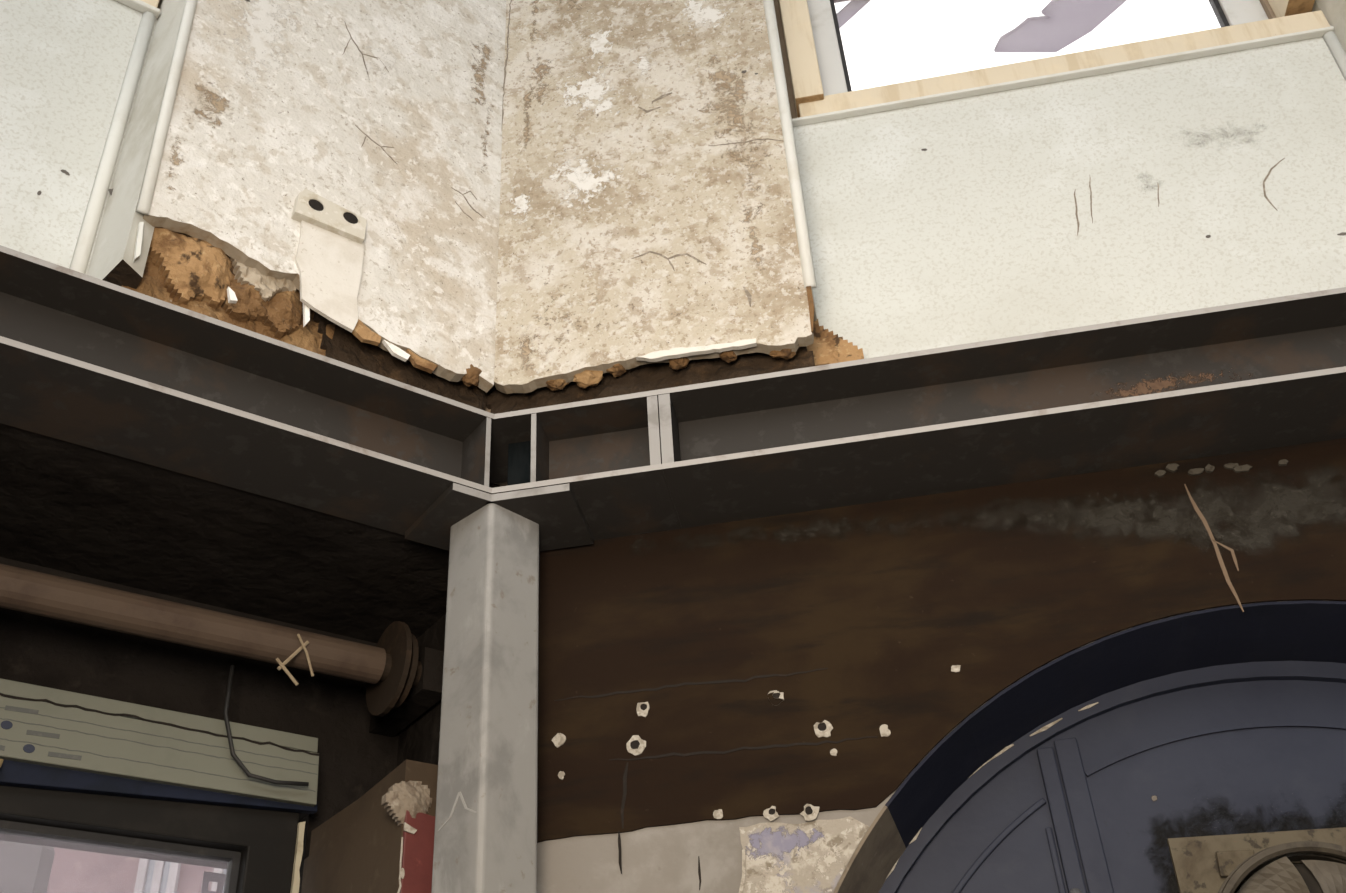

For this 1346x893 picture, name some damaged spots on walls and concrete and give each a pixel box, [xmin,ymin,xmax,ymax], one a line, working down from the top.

leakage [524,57,553,146]
leakage [699,55,768,271]
spalling [121,222,864,414]
leakage [520,309,581,369]
spalling [552,733,566,748]
spalling [626,735,646,756]
spalling [636,702,650,717]
spalling [814,720,838,756]
spalling [879,724,891,737]
peeling [970,744,1014,777]
peeling [1030,718,1063,737]
peeling [739,804,869,893]